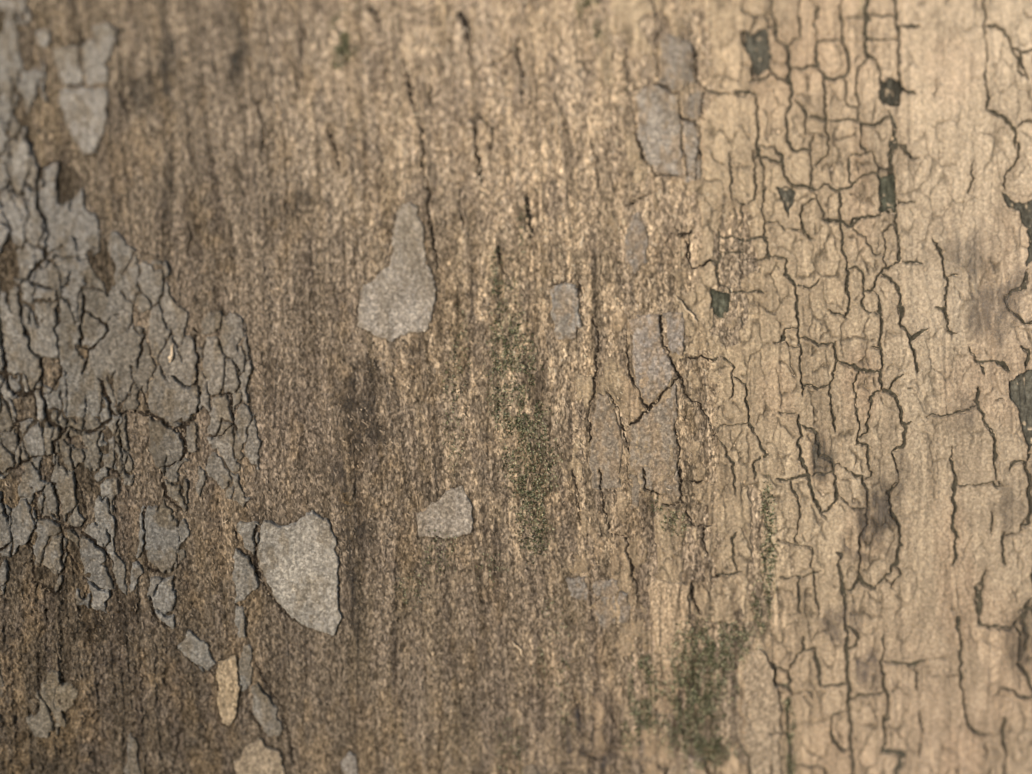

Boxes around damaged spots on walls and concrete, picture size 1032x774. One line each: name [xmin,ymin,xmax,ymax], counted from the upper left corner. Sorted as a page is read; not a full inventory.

peeling [635,34,704,183]
peeling [0,0,261,629]
peeling [357,201,437,342]
peeling [624,211,648,276]
peeling [1002,193,1032,266]
peeling [589,312,685,510]
crack [553,0,1032,774]
peeling [1009,370,1032,451]
peeling [417,485,473,539]
peeling [26,669,79,738]
peeling [123,733,141,774]
peeling [178,510,343,774]